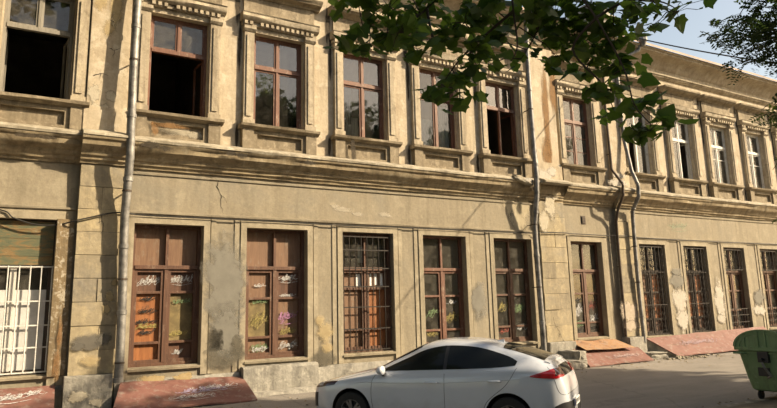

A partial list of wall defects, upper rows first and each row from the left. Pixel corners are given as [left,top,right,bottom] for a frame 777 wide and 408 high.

peeling [539,167,556,179]
spalling [532,186,558,232]
peeling [672,289,689,333]
peeling [714,281,726,322]
damp [208,330,246,370]